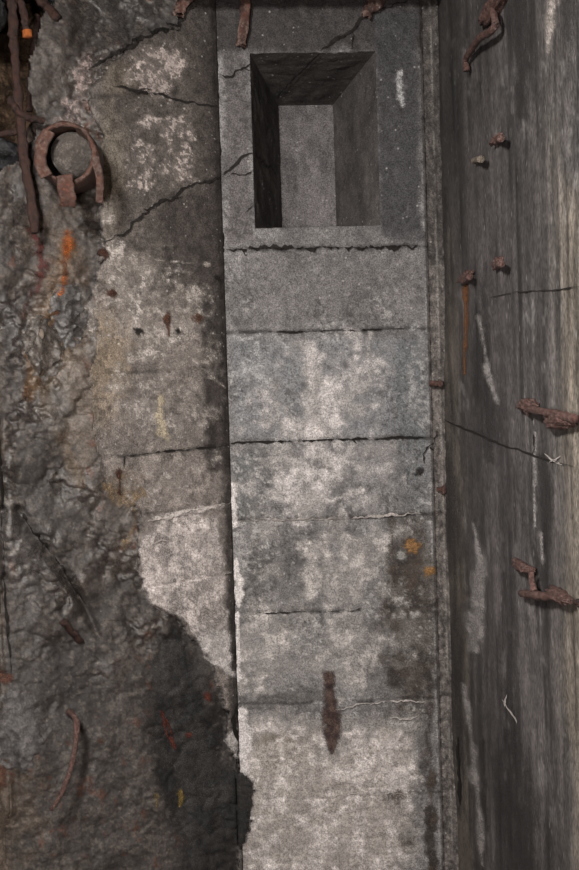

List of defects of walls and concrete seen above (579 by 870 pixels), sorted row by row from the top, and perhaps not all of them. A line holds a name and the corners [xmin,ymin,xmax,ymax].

crack [87,3,191,73]
crack [278,0,423,98]
corrosion [34,121,105,208]
corrosion [23,227,50,318]
crack [103,55,578,769]
water stain [474,315,498,461]
water stain [533,432,553,579]
water stain [140,328,438,870]
water stain [445,397,539,870]
corrosion [321,671,341,754]